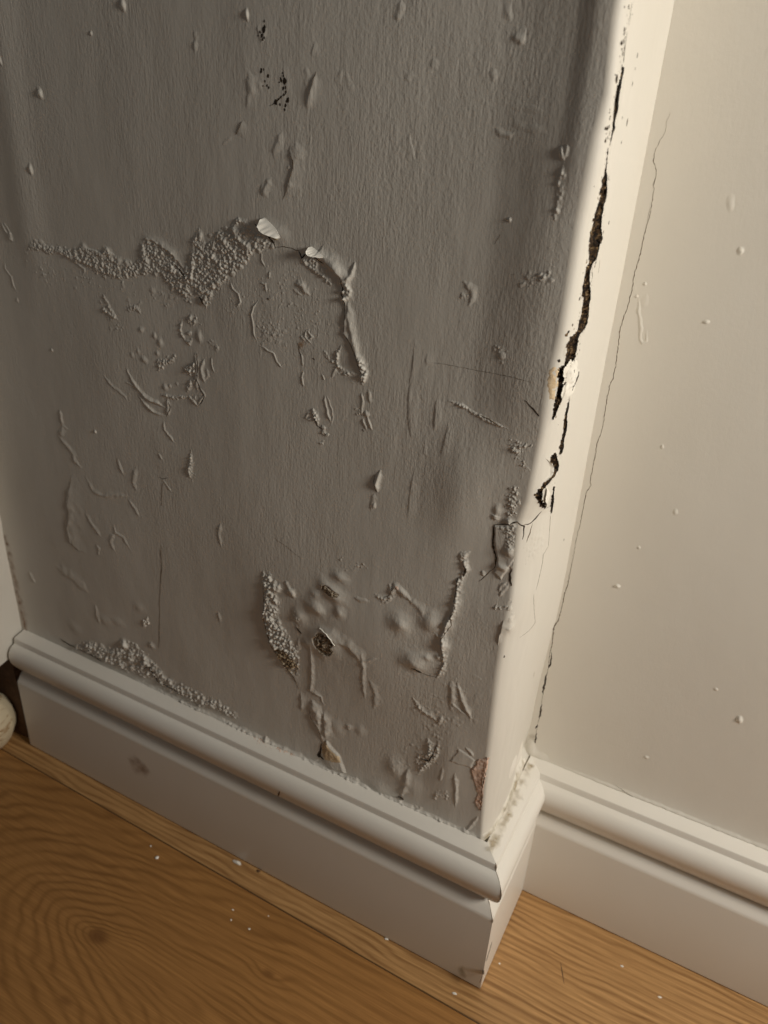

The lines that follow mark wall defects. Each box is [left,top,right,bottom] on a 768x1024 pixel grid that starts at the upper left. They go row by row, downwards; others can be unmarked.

peeling [255,215,373,431]
peeling [103,351,210,417]
crack [439,6,670,743]
flaking render [481,439,533,611]
flaking render [320,585,338,598]
peeling [61,636,239,720]
flaking render [273,649,298,674]
flaking render [296,627,334,656]
peeling [309,699,368,774]
peeling [360,674,490,831]